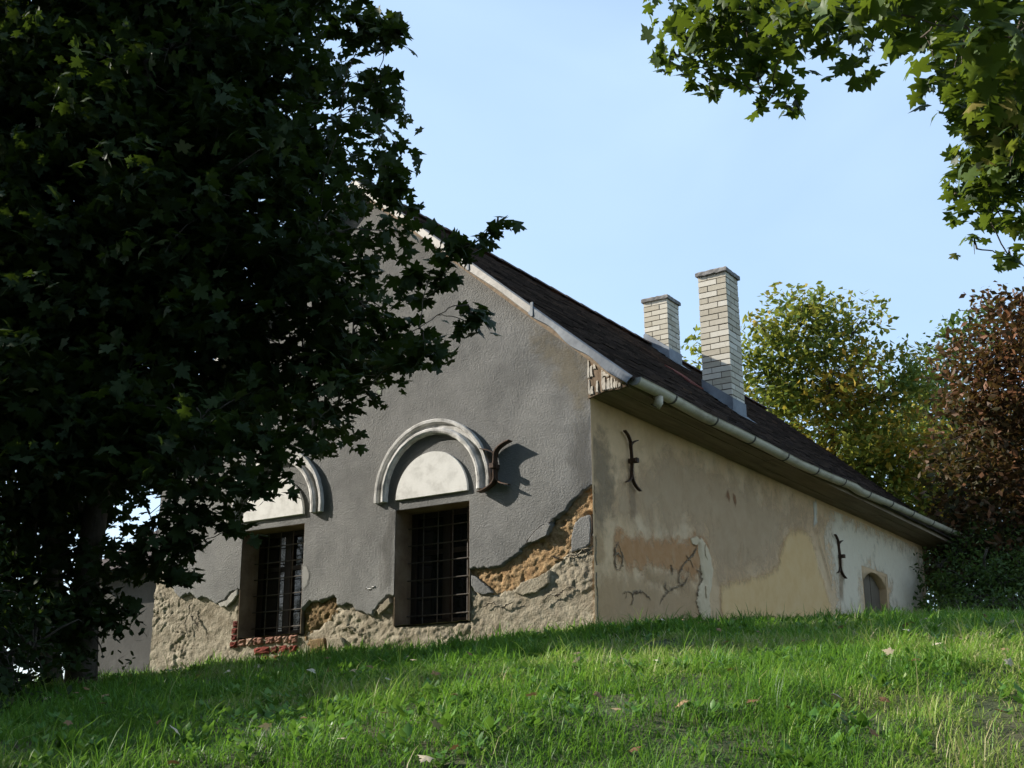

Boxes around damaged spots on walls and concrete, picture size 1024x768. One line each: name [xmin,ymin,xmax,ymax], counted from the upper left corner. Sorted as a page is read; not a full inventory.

spalling [149,485,599,673]
crack [614,543,702,613]
water stain [593,439,923,615]